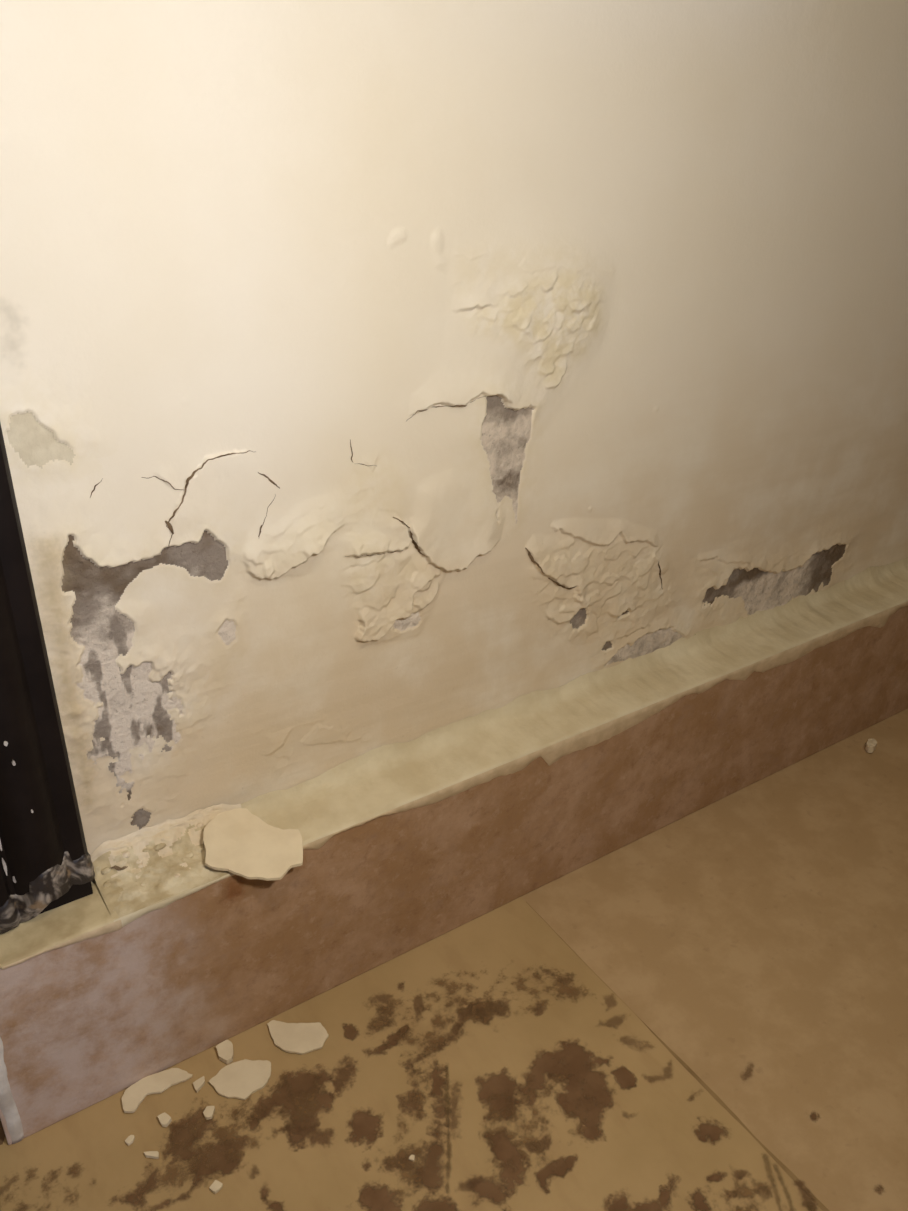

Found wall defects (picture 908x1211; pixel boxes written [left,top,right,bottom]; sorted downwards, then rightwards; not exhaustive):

crack [141,450,280,550]
spalling [0,361,868,927]